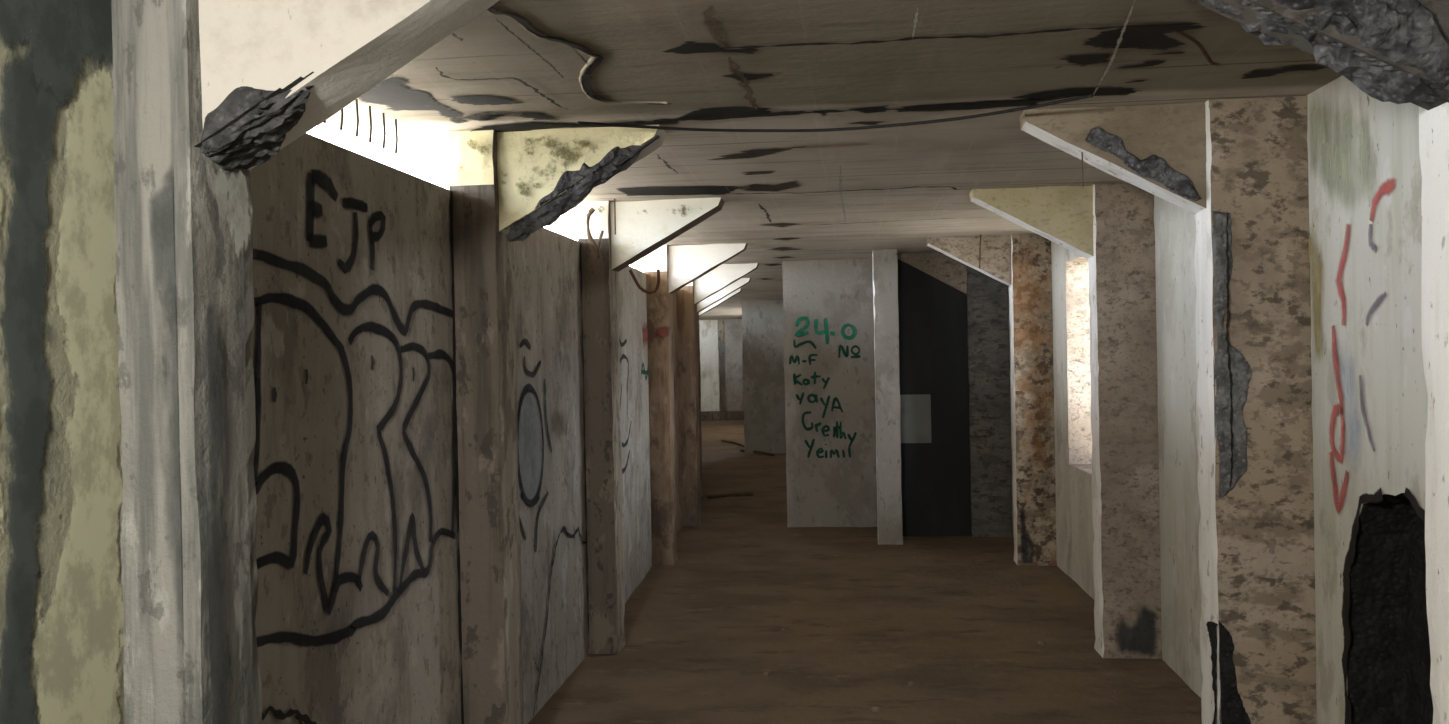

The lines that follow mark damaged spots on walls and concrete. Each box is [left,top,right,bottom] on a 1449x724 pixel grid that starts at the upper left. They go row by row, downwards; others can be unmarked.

spalling [194,72,314,257]
spalling [501,135,660,242]
crack [436,6,1190,226]
spalling [1060,23,1205,83]
spalling [1196,0,1449,104]
damp [0,0,113,724]
spalling [1085,126,1253,498]
crack [262,706,317,724]
spalling [1206,617,1251,724]
spalling [1342,488,1383,724]
spalling [1403,488,1434,724]